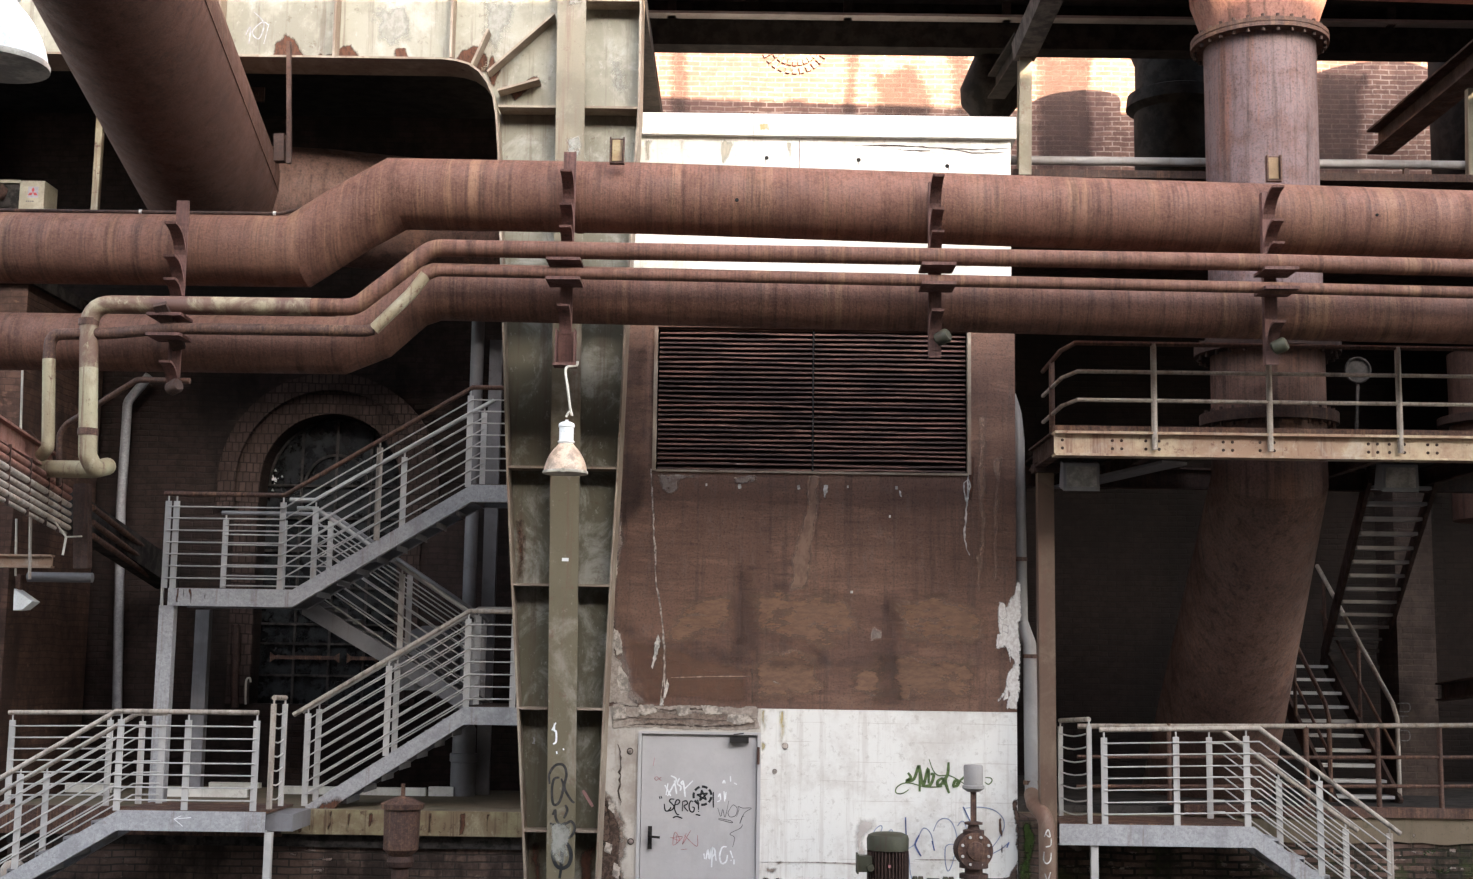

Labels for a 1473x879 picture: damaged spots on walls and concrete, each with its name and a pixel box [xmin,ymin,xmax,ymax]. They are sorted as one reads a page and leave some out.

rust [274,35,358,56]
rust [394,48,408,57]
rust [457,45,541,101]
rust [43,239,1473,359]
crack [650,469,753,706]
peeling [609,622,759,730]
peeling [996,582,1022,709]